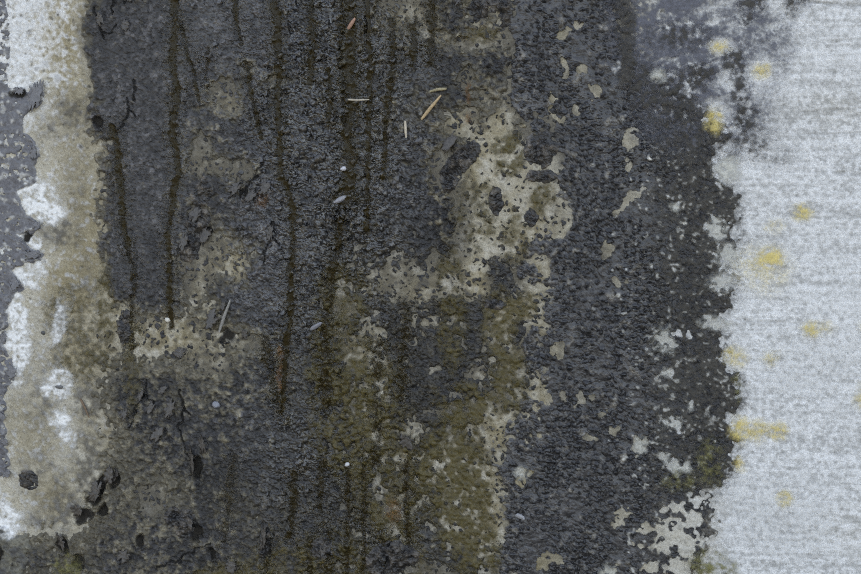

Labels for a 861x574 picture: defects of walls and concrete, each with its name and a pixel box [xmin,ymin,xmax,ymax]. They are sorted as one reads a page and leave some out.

peeling [0,0,45,478]
damp [108,123,131,261]
damp [163,0,210,330]
damp [244,0,302,414]
damp [317,218,344,409]
damp [319,0,397,234]
damp [408,0,437,67]
damp [607,0,788,499]
peeling [70,464,120,524]
damp [285,471,298,540]
damp [402,462,411,547]
damp [734,478,829,552]